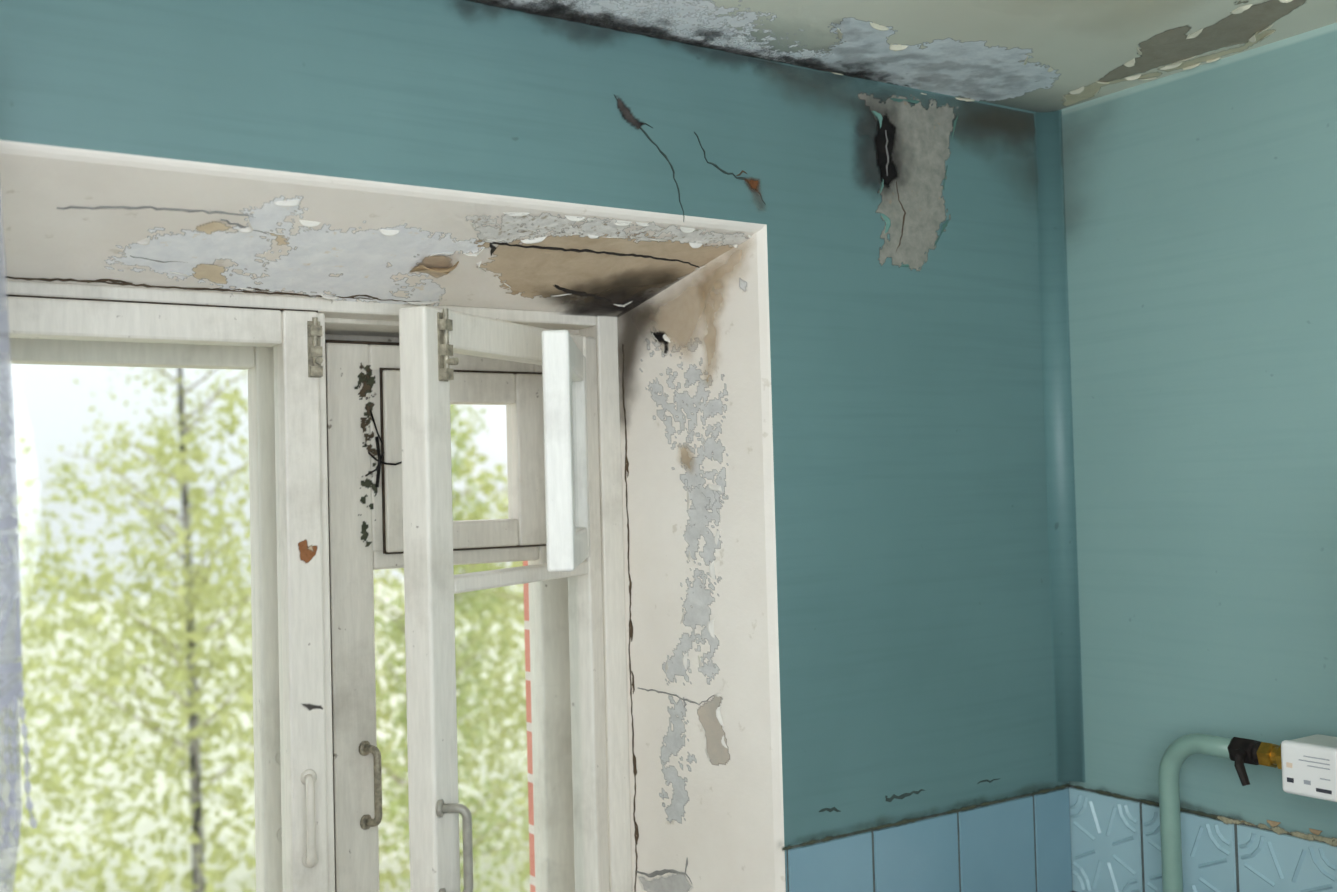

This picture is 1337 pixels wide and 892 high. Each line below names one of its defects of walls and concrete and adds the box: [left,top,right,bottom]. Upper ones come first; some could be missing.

leakage [466,0,887,81]
crack [614,94,684,222]
crack [694,132,766,205]
peeling [777,0,1306,271]
peeling [105,196,752,306]
peeling [640,327,730,823]